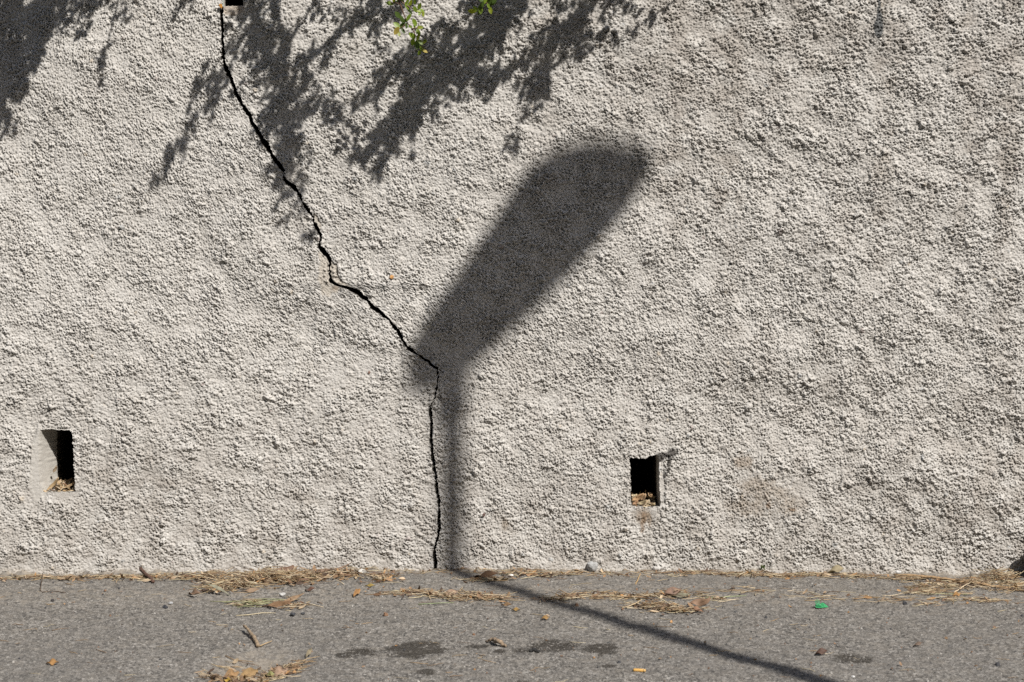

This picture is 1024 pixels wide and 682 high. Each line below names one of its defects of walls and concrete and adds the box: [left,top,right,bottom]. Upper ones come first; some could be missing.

crack [219,7,449,568]